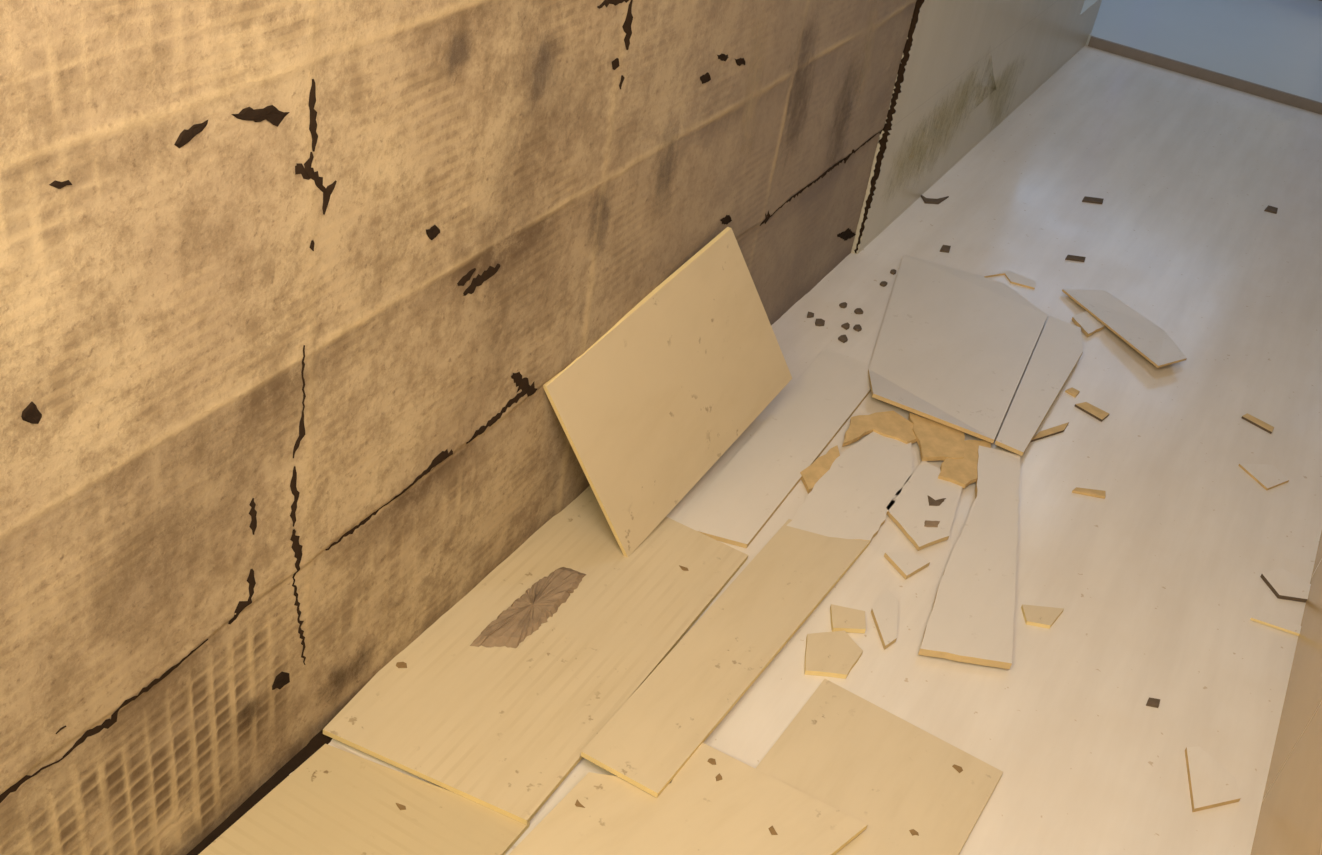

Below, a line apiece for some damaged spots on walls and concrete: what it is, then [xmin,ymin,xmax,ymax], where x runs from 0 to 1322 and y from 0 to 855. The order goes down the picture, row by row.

spalling [716,53,745,66]
spalling [231,105,289,127]
spalling [174,120,208,148]
crack [295,79,337,251]
spalling [49,180,72,189]
spalling [426,225,440,240]
spalling [457,263,500,296]
spalling [21,402,42,424]
crack [249,498,257,535]
crack [290,345,537,665]
crack [0,569,256,803]
spalling [272,672,290,690]